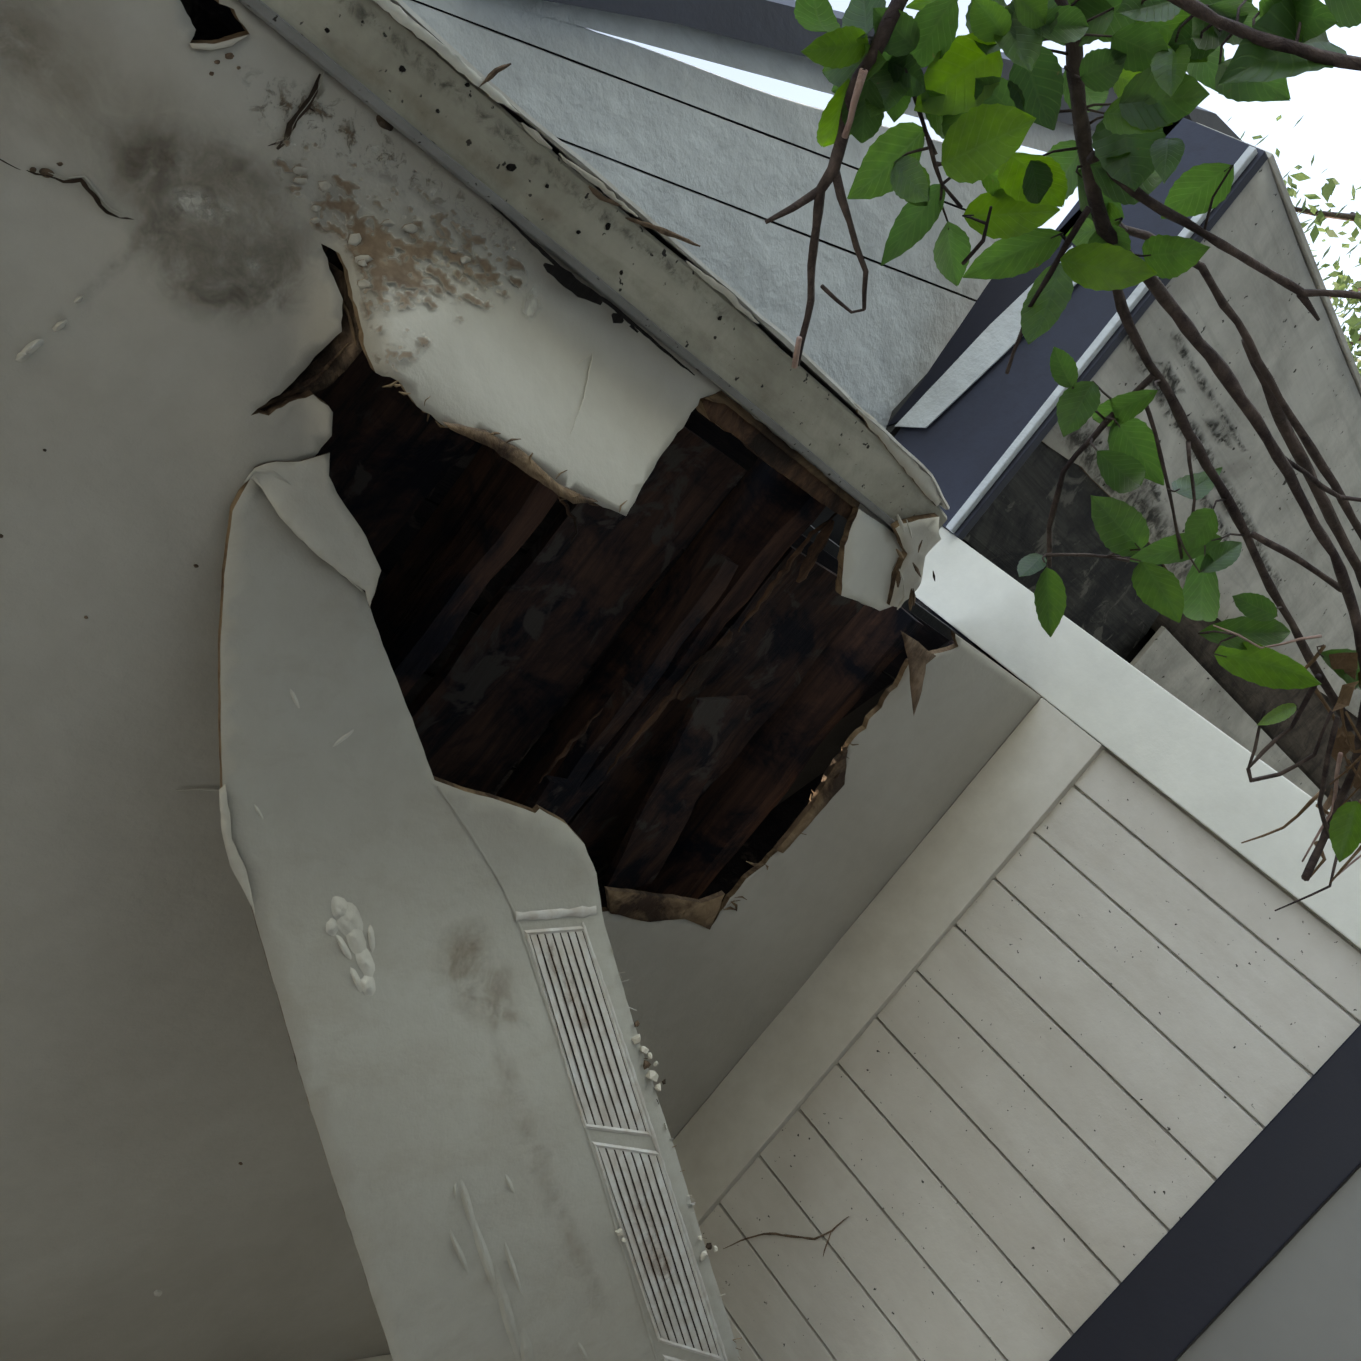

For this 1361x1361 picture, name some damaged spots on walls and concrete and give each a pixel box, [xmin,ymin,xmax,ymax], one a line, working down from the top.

leakage [260,90,394,160]
crack [0,159,134,220]
peeling [258,140,525,410]
peeling [442,421,598,504]
peeling [245,452,381,607]
peeling [774,747,848,853]
peeling [604,886,725,930]